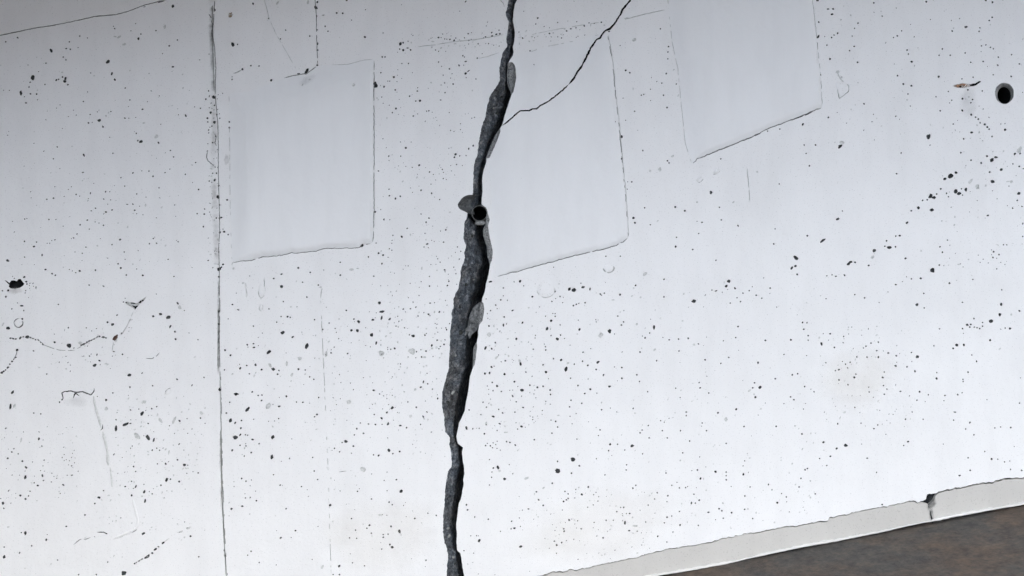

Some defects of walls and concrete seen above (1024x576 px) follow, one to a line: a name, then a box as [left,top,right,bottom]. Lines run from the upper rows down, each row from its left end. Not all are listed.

crack [442,0,631,576]